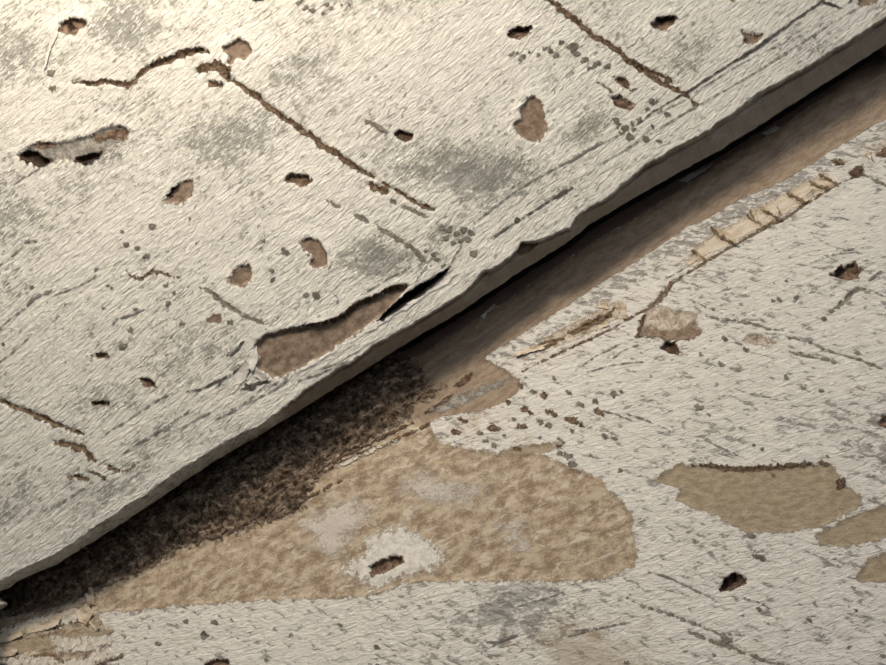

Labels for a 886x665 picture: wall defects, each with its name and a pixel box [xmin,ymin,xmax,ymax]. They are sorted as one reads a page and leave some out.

spalling [43,17,88,92]
spalling [221,38,252,66]
spalling [507,25,533,40]
spalling [506,40,671,143]
crack [544,0,699,106]
spalling [17,123,133,169]
crack [72,46,435,218]
crack [326,199,432,267]
crack [0,267,99,329]
crack [126,269,269,324]
peeling [76,59,886,626]
crack [0,399,140,482]